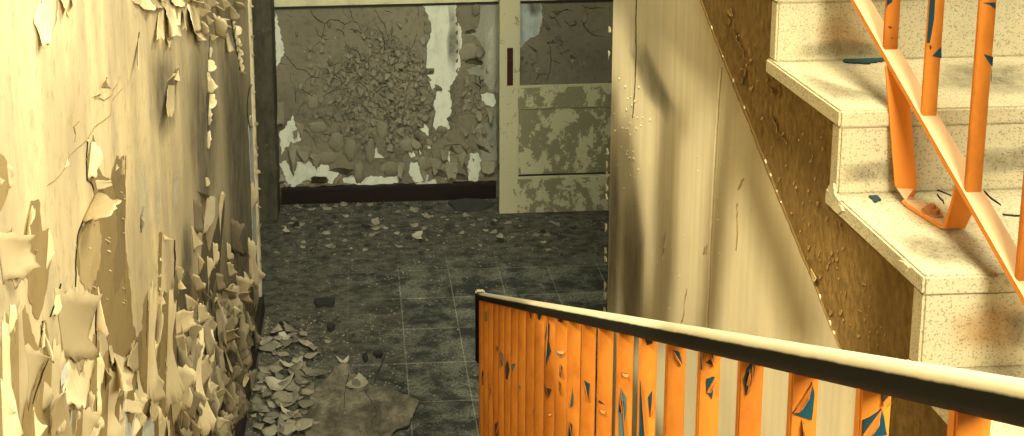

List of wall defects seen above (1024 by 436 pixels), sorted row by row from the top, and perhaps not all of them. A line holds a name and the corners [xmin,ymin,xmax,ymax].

peeling [34,0,77,49]
peeling [133,0,255,150]
crack [279,6,424,159]
flaking render [275,4,498,188]
peeling [0,90,266,436]